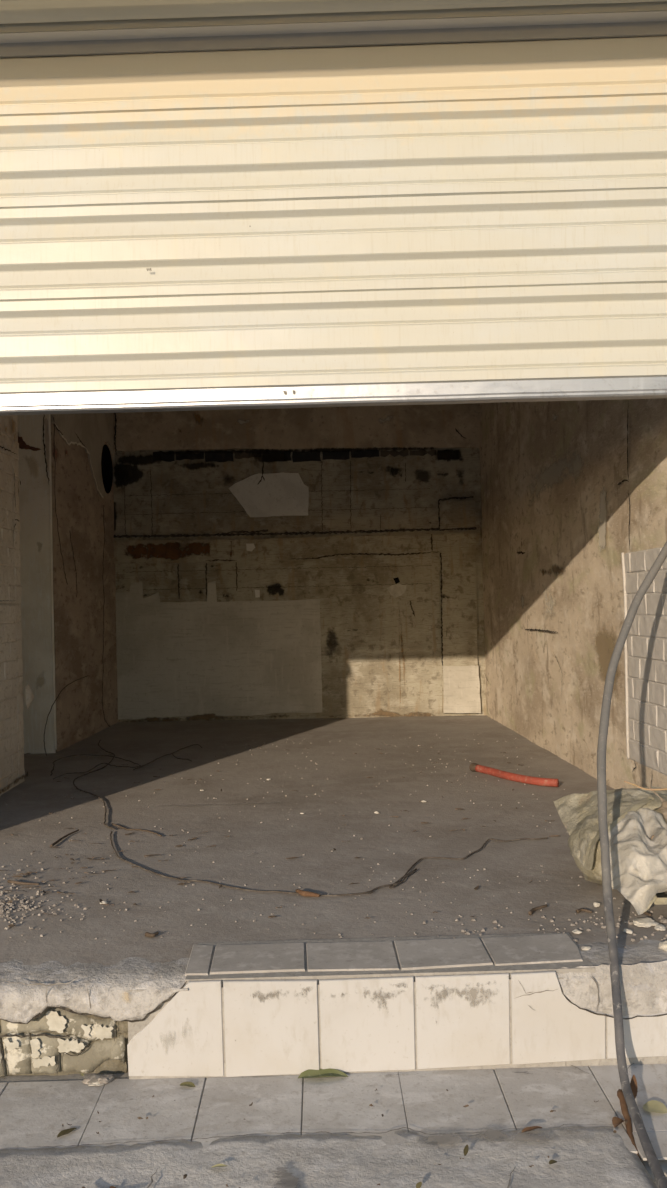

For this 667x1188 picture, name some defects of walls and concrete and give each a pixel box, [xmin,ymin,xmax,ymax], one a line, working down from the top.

water stain [431,987,491,1006]
crack [516,974,667,1019]
spalling [0,1007,128,1077]
crack [10,1124,618,1188]